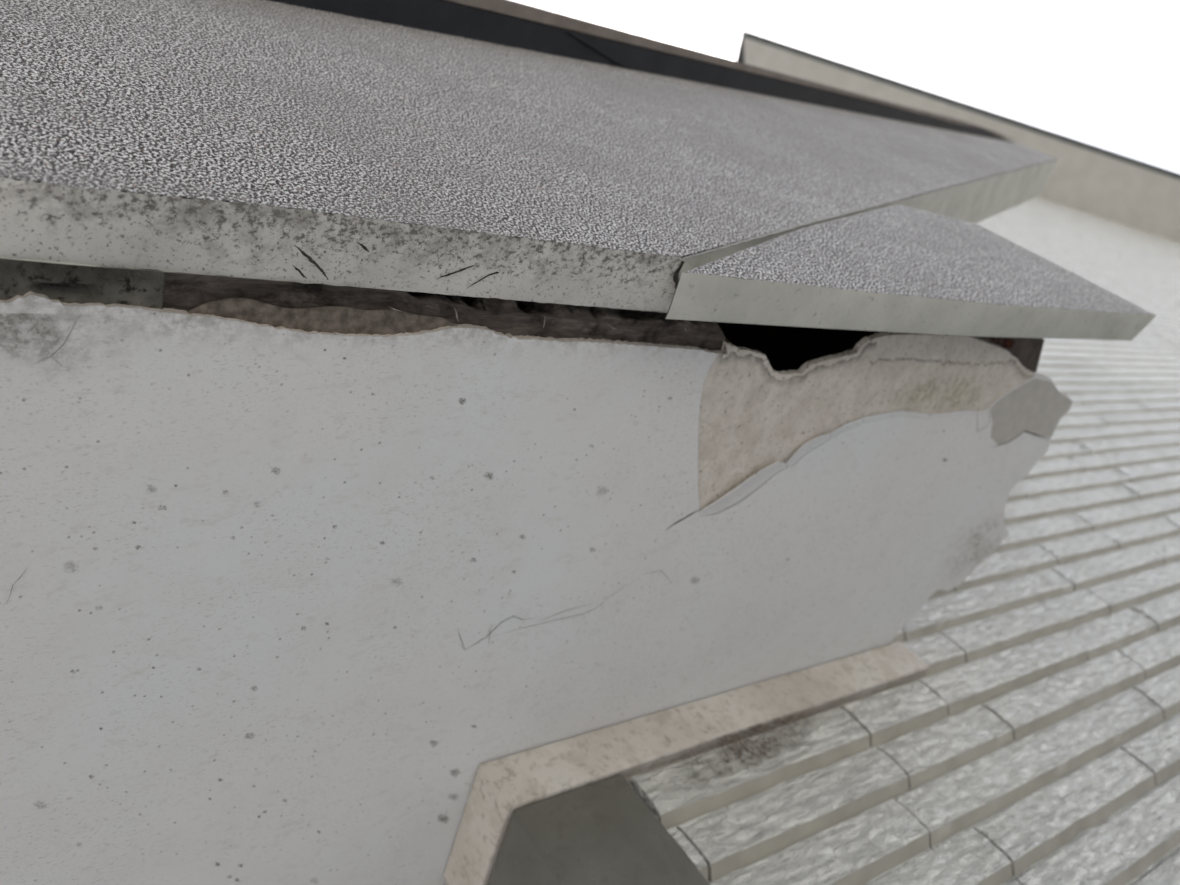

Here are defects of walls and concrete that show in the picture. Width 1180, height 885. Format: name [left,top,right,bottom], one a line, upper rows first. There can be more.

spalling [293,245,329,280]
peeling [698,332,1072,517]
crack [458,570,669,650]